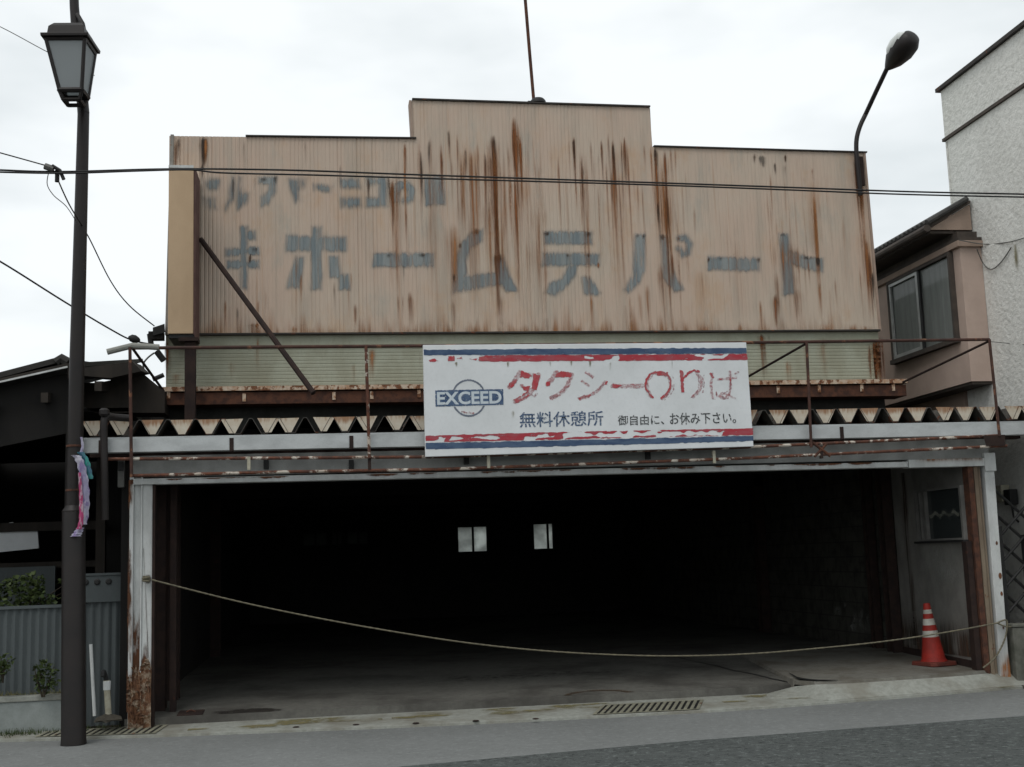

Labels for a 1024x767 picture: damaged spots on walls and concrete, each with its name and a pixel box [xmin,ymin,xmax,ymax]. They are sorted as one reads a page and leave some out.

rust [388,146,406,213]
rust [420,123,522,286]
rust [601,139,630,230]
rust [651,149,680,279]
rust [774,201,820,323]
rust [126,554,152,729]